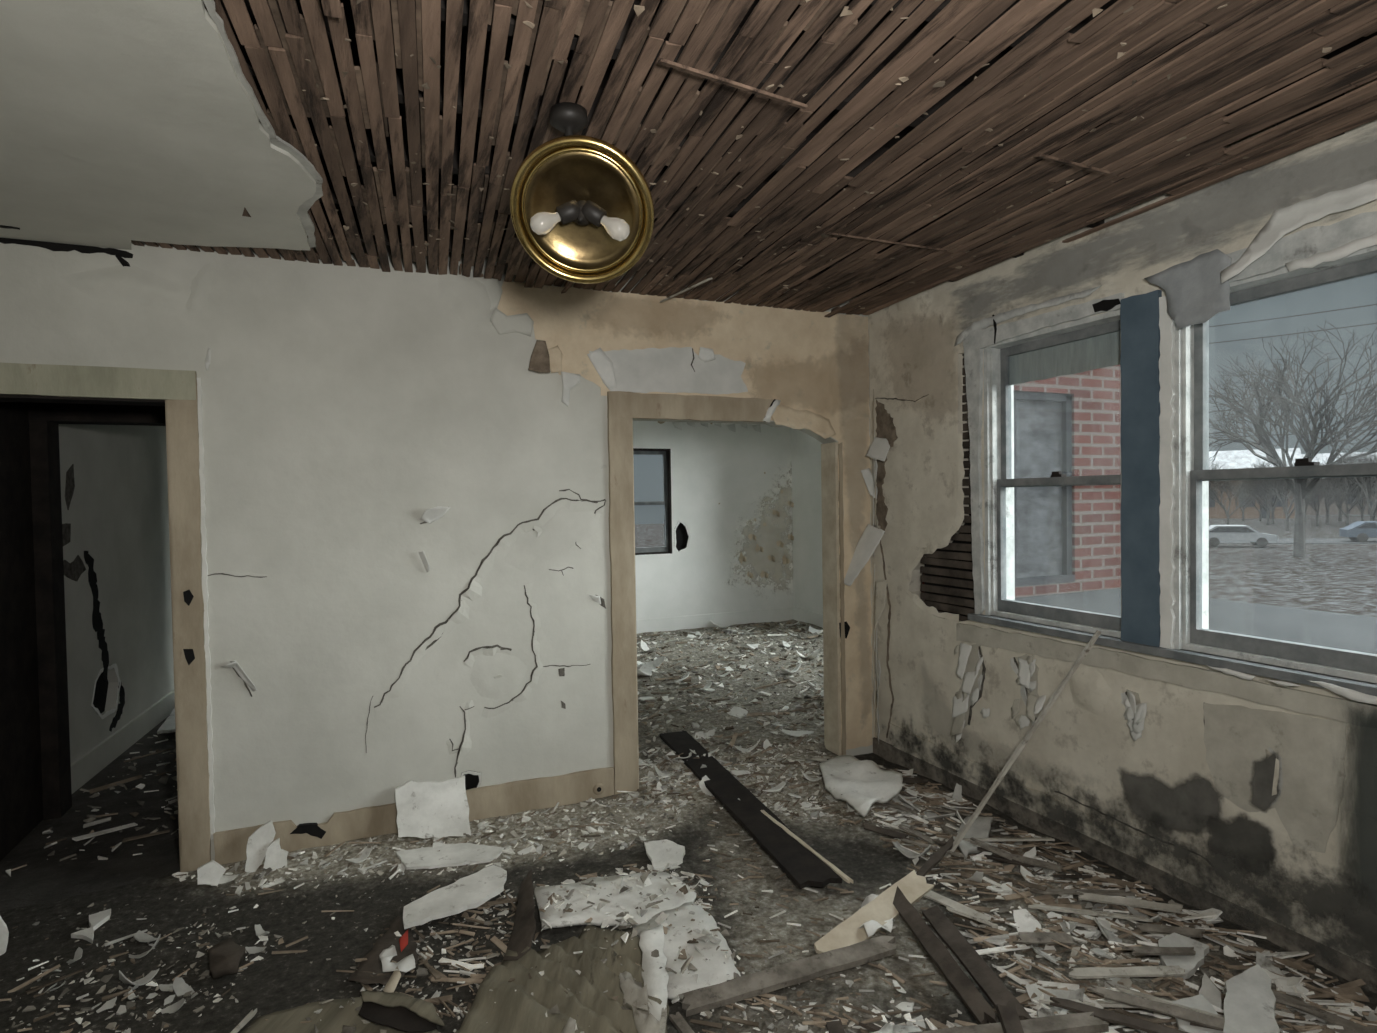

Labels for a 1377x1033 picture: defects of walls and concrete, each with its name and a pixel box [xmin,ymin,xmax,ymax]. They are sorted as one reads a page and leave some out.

crack [115,255,130,267]
spalling [131,0,1377,853]
crack [365,489,609,777]
flaking render [92,663,121,719]
damp [890,710,1377,973]
peeling [1110,824,1276,923]
peeling [1280,899,1348,956]